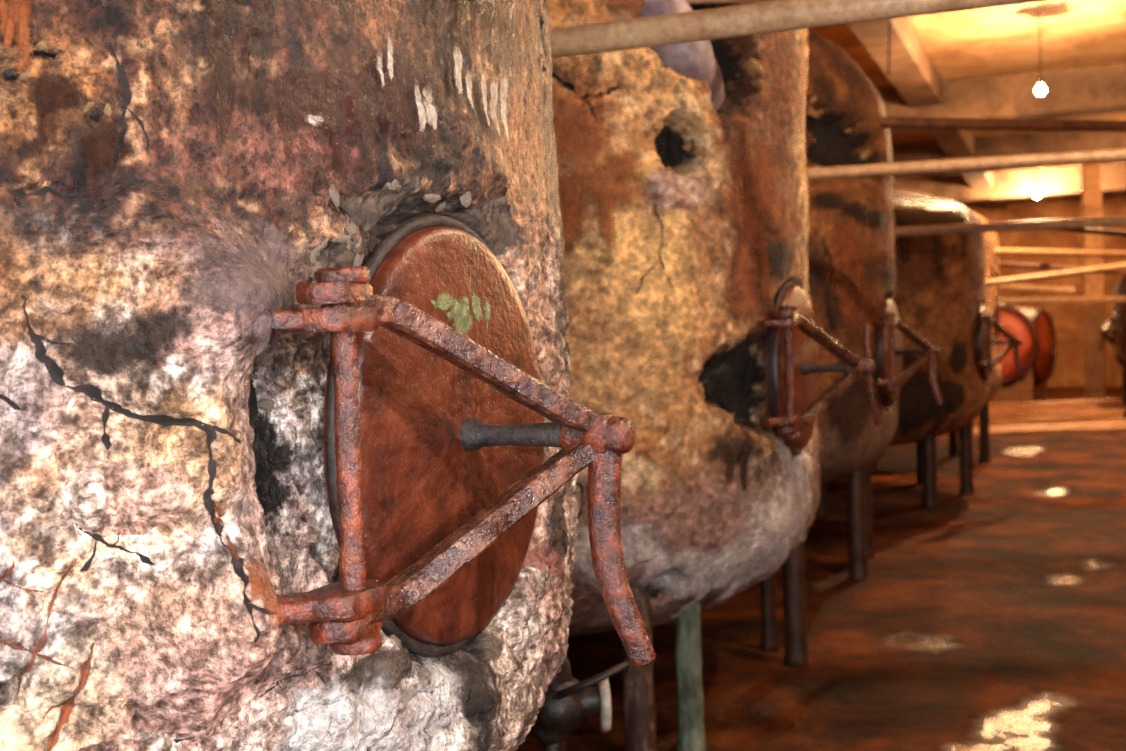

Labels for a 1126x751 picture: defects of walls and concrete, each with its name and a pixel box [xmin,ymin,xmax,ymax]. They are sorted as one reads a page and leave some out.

spalling [654,120,709,175]
crack [0,394,26,410]
crack [22,295,279,643]
spalling [248,351,294,536]
spalling [698,331,770,447]
crack [0,514,155,751]